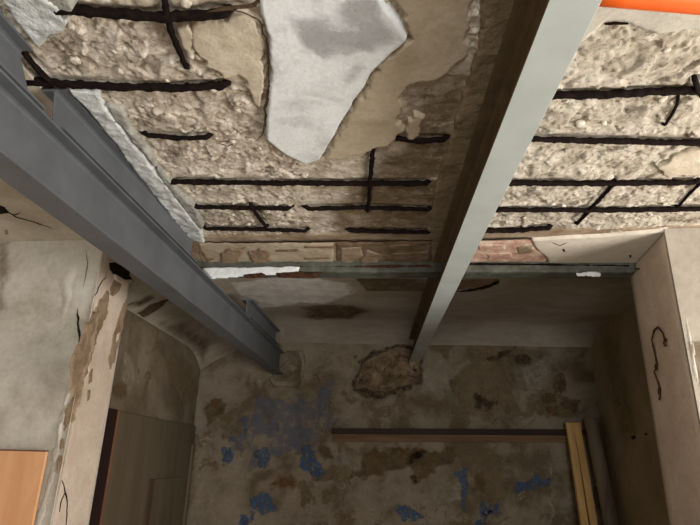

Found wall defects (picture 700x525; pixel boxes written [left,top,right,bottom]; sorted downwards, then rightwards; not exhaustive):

spalling [0,0,481,308]
spalling [471,21,700,262]
crack [0,205,50,228]
crack [75,308,83,342]
leakage [307,306,363,318]
peeling [36,262,133,525]
flaking render [352,344,423,398]
leakage [421,345,549,420]
crack [59,481,68,524]